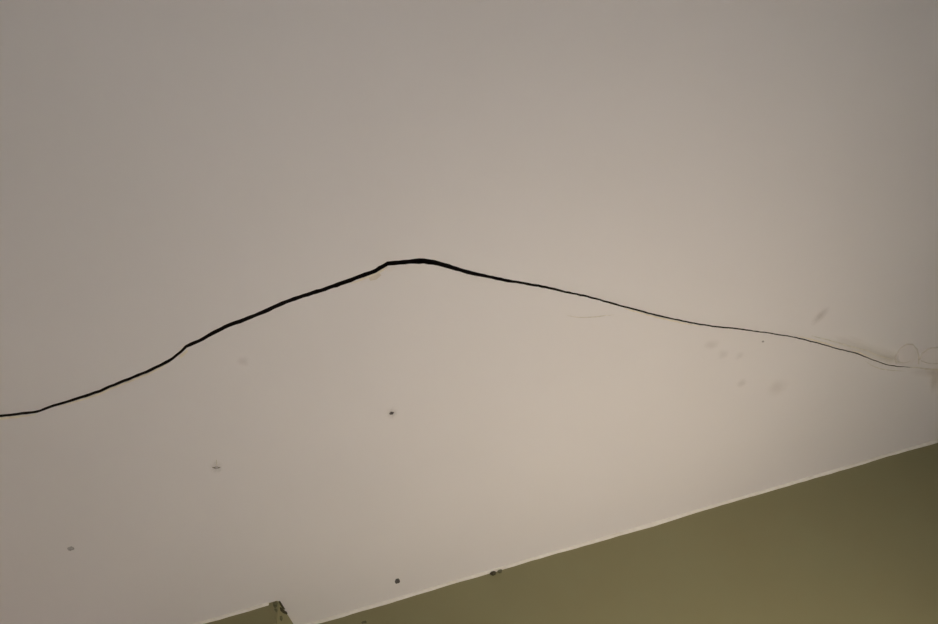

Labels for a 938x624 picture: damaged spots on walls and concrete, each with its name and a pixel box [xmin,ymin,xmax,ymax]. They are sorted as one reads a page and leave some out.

crack [0,258,938,420]